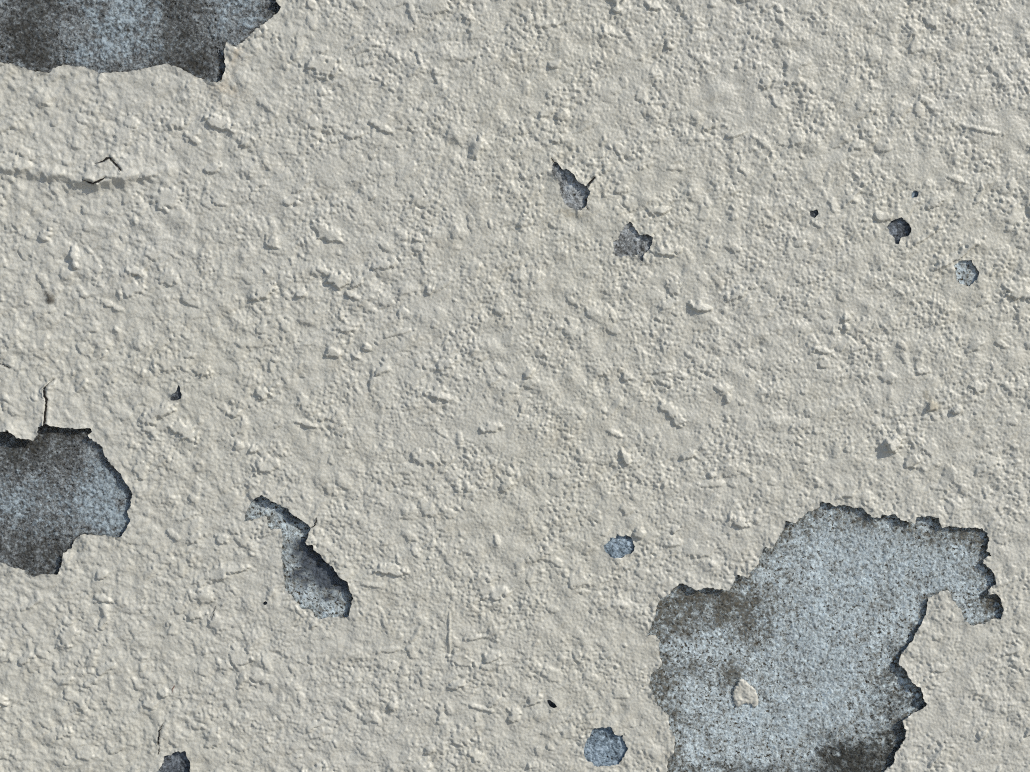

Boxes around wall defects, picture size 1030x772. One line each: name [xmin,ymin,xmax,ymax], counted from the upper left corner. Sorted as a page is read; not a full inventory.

peeling [0,0,285,87]
peeling [548,158,593,213]
peeling [610,218,657,264]
peeling [884,214,915,247]
peeling [951,257,982,290]
crack [41,378,52,426]
peeling [0,420,136,580]
peeling [241,492,357,622]
peeling [600,529,639,561]
peeling [644,498,1007,772]
peeling [127,747,194,772]
peeling [580,723,631,770]